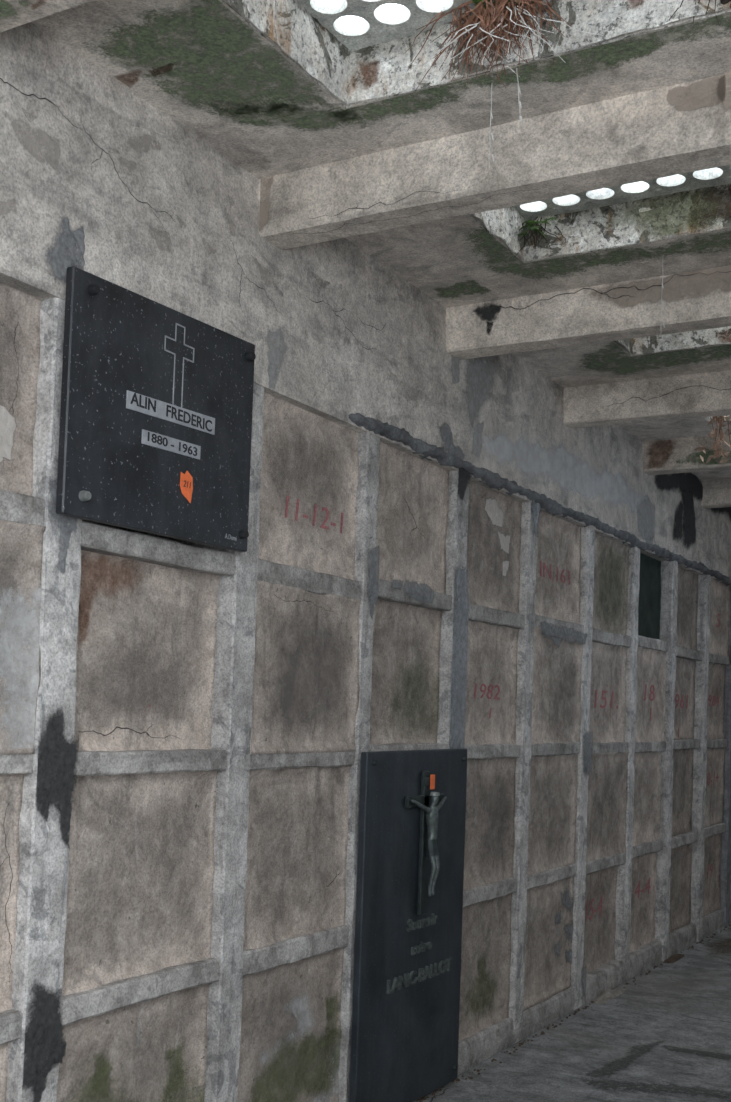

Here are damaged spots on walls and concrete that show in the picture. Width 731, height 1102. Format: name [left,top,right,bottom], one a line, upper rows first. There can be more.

damp [668,72,731,110]
damp [212,103,357,131]
damp [591,266,731,307]
peeling [37,788,50,821]
damp [166,1049,183,1091]